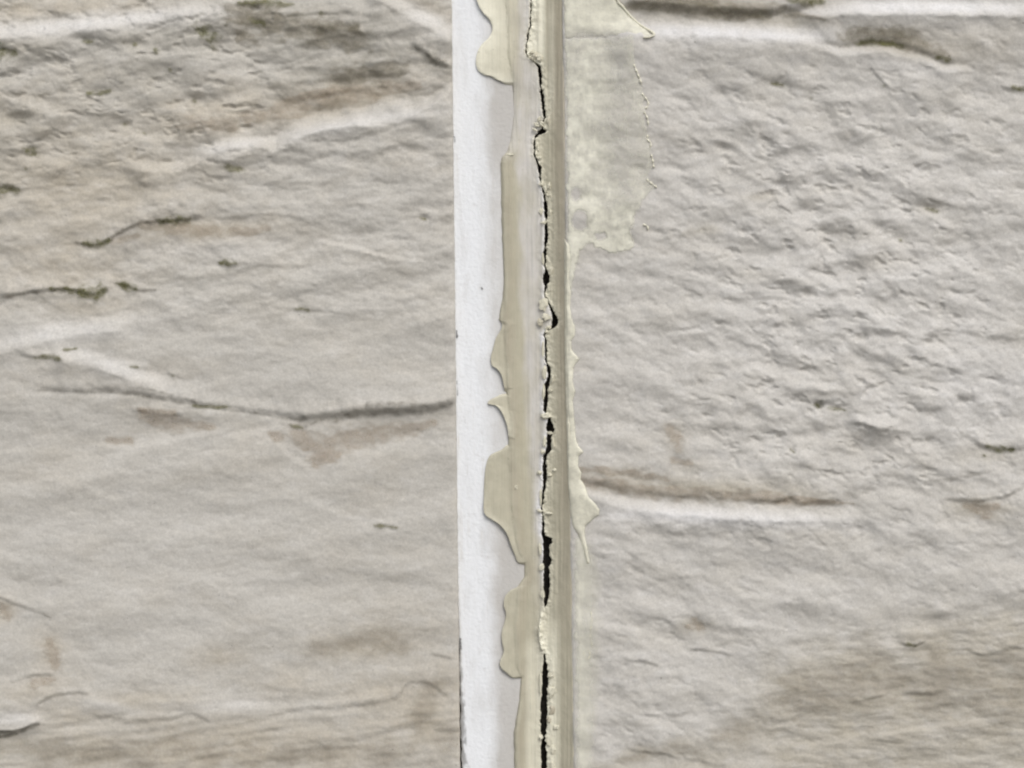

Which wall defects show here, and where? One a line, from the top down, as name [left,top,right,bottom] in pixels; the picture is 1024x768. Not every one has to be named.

crack [525,0,558,606]
crack [539,654,559,768]